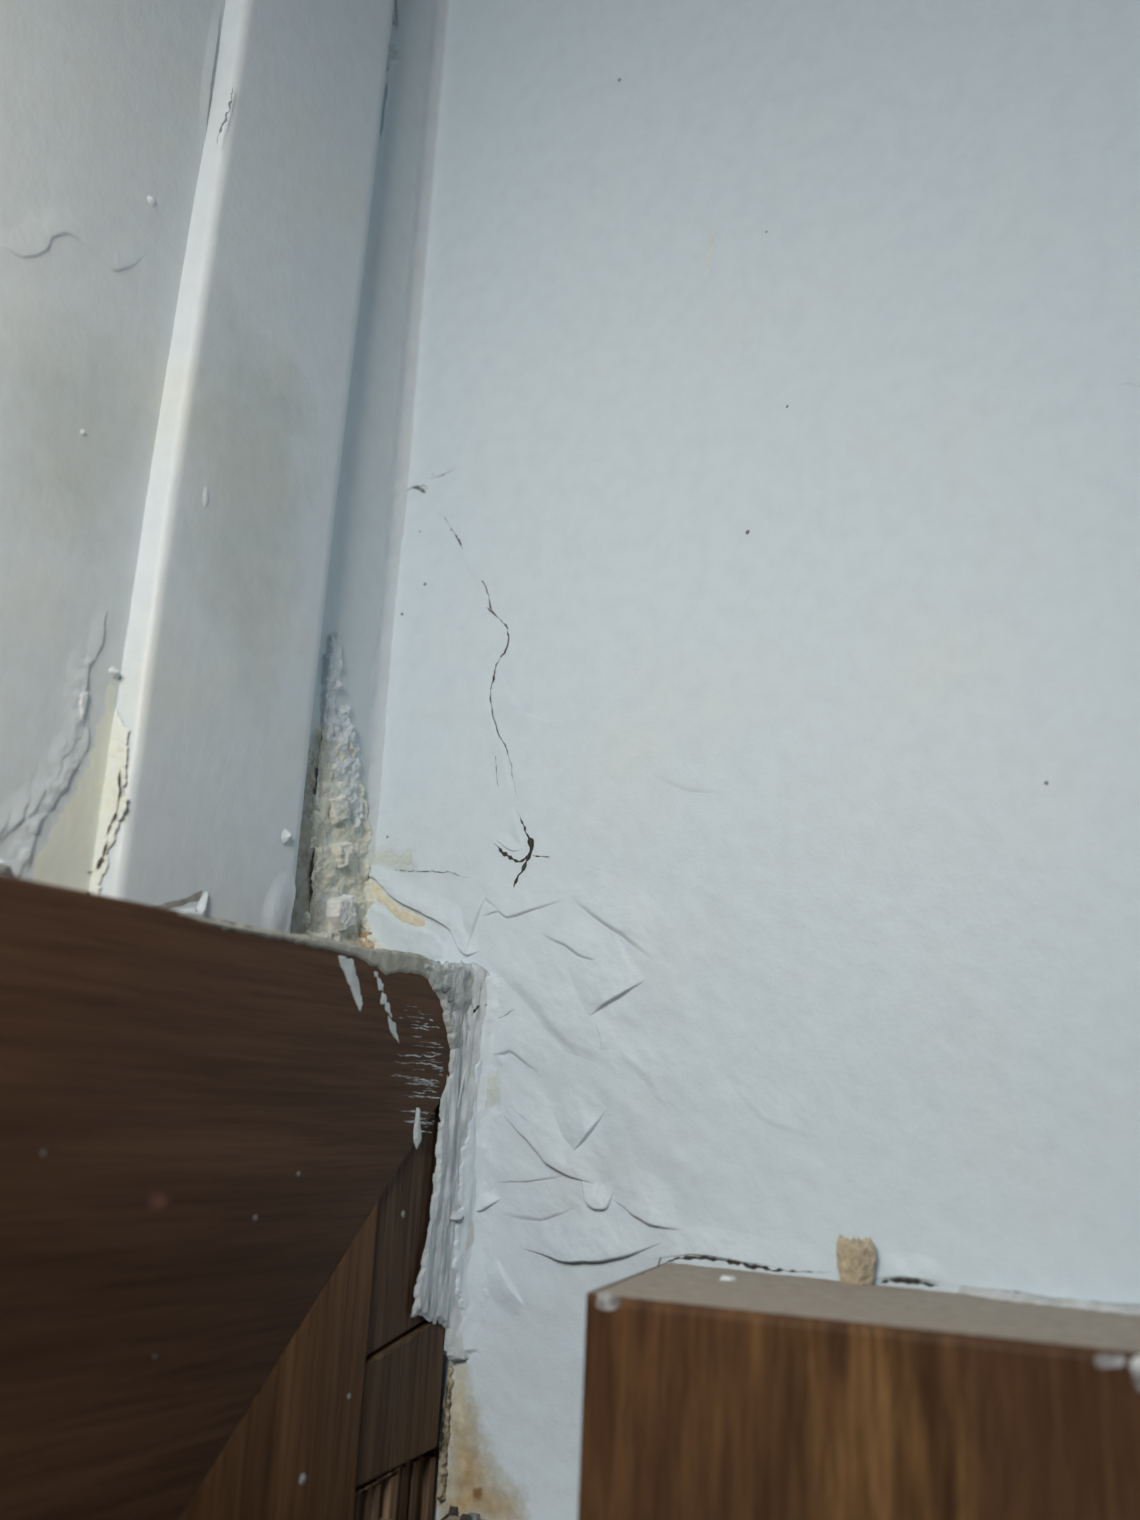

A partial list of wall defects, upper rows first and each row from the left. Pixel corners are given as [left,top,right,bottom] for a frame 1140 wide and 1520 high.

peeling [0,604,129,894]
crack [88,772,121,893]
peeling [155,890,209,916]
spalling [302,629,480,961]
crack [395,869,470,878]
crack [407,468,548,887]
rust [442,1368,513,1520]